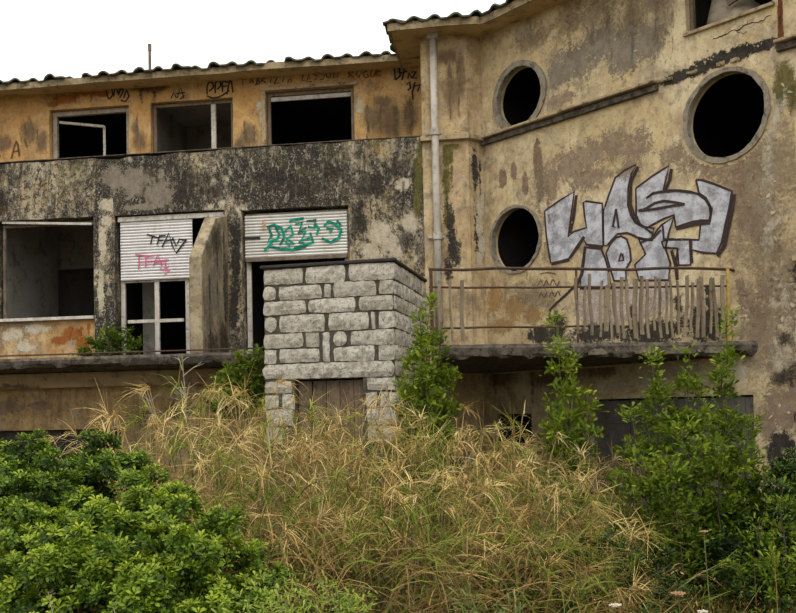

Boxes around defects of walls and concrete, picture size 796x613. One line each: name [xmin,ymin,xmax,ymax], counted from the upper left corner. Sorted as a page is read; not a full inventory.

crack [713,15,771,39]
spalling [656,37,785,87]
damp [102,162,230,212]
damp [443,150,462,285]
damp [471,147,484,252]
peeling [498,80,796,374]
damp [521,69,796,481]
peeling [1,322,53,355]
peeling [586,345,750,392]
spalling [758,382,796,441]